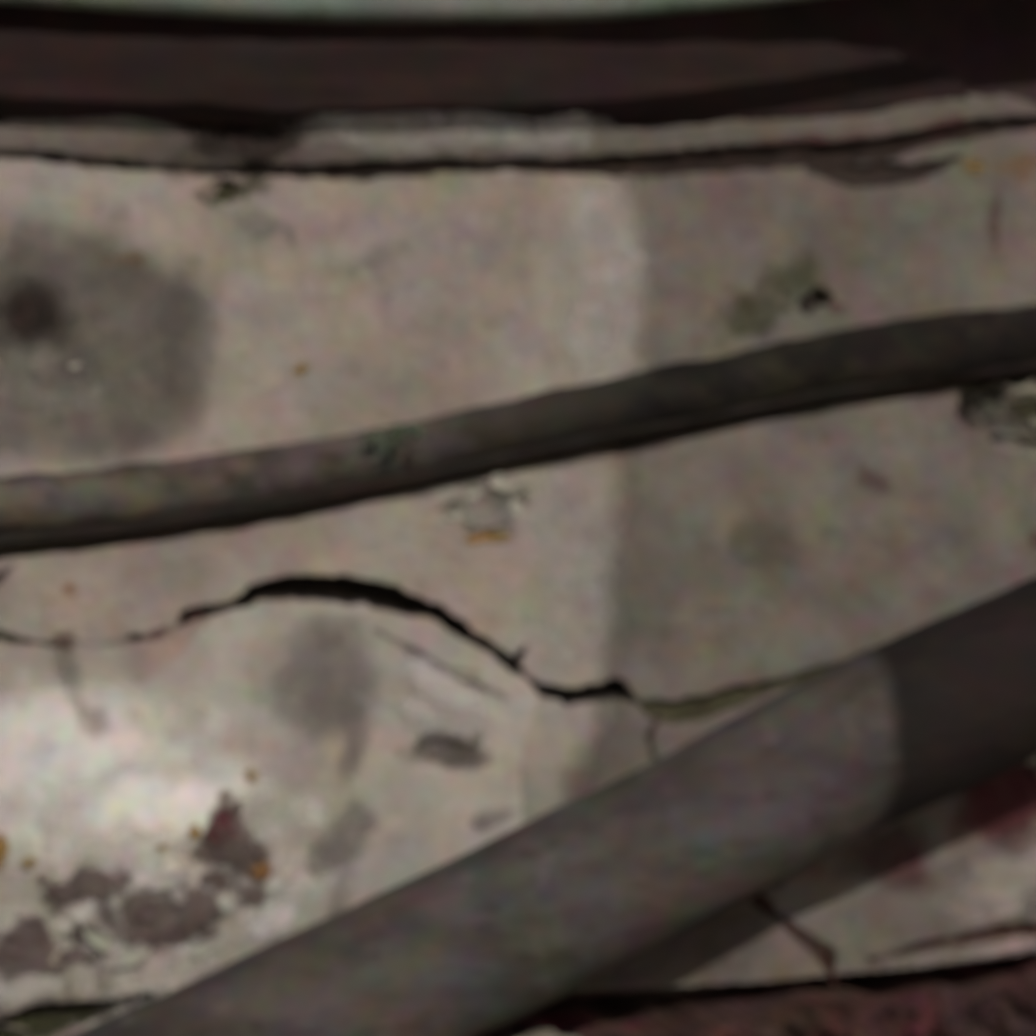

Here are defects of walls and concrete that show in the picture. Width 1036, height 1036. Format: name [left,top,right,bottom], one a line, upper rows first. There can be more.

damp [0,240,189,450]
spalling [993,374,1036,432]
crack [0,569,8,582]
crack [0,631,73,647]
crack [125,634,143,642]
crack [177,575,872,759]
spalling [411,704,480,767]
peeling [0,791,269,987]